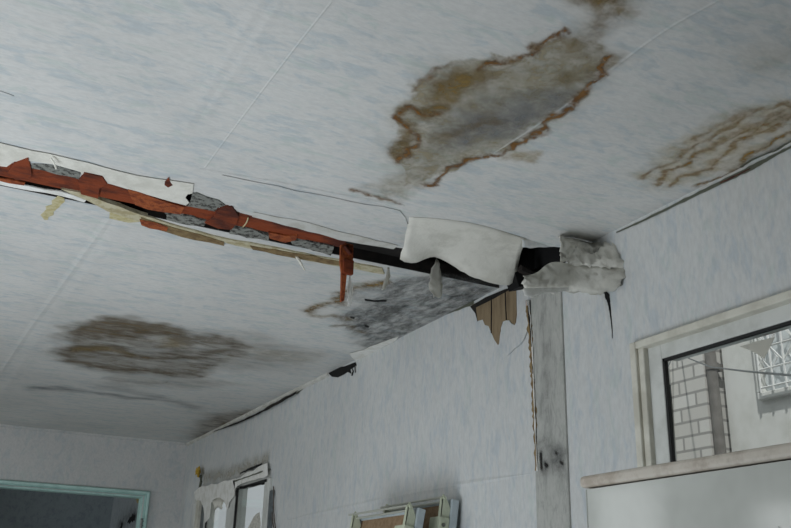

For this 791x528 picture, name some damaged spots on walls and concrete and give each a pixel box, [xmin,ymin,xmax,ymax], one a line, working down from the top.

damp [392,27,612,187]
damp [657,103,791,186]
crack [616,141,791,233]
damp [59,318,242,377]
mould [304,281,421,345]